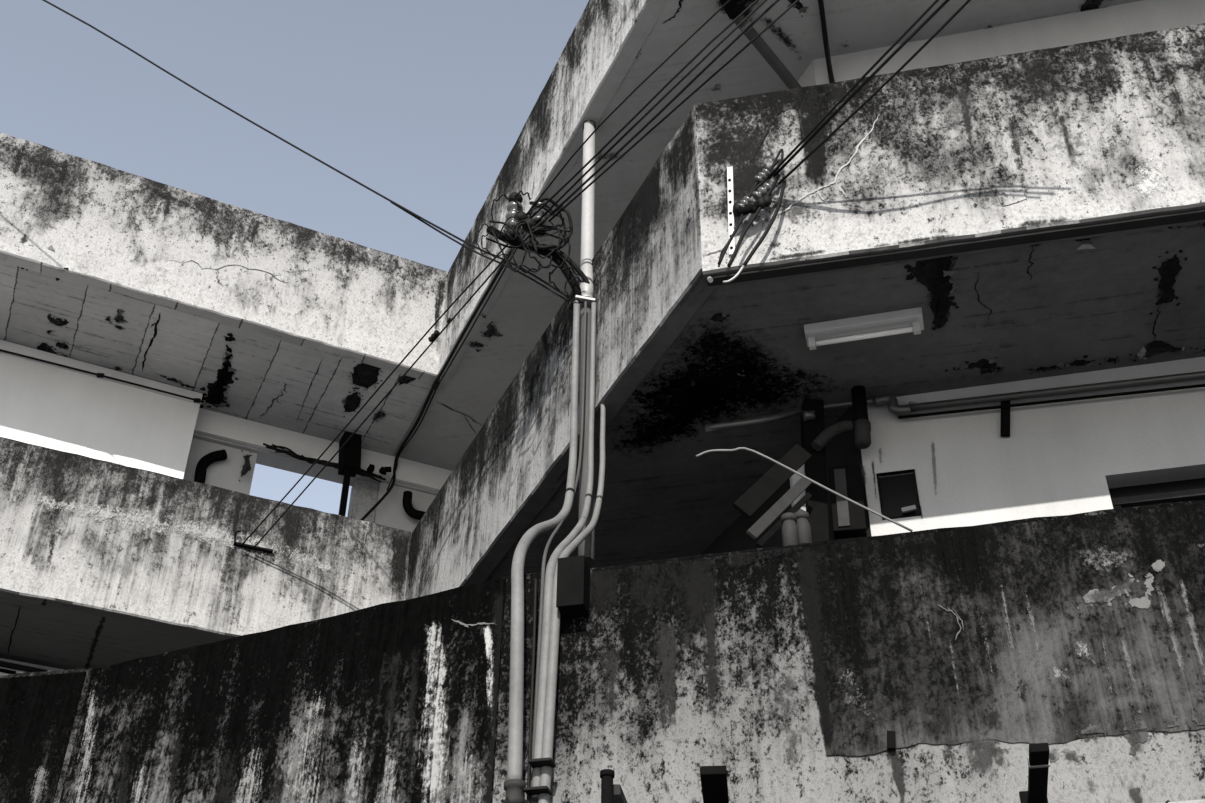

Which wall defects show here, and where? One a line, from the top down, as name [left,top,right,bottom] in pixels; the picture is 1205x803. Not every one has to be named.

water stain [618,90,835,262]
peeling [35,313,71,358]
crack [142,314,160,372]
spalling [160,333,239,408]
water stain [435,280,450,330]
spalling [904,256,960,330]
spalling [1149,250,1188,315]
water stain [590,545,833,767]
water stain [375,593,503,803]
water stain [72,695,96,803]
water stain [214,692,328,803]
water stain [344,733,367,803]